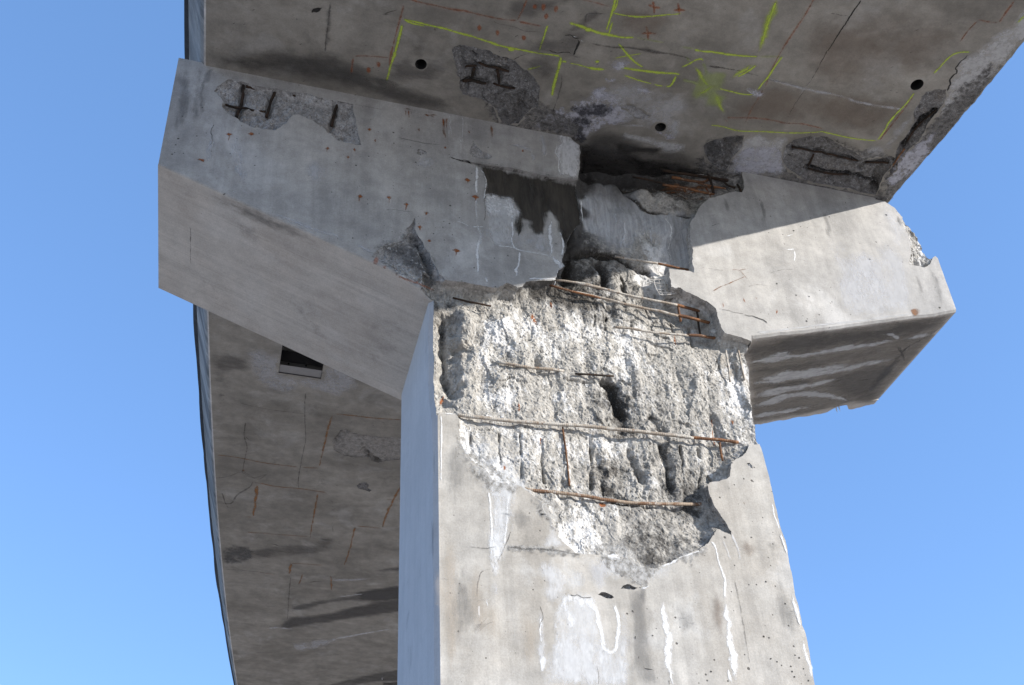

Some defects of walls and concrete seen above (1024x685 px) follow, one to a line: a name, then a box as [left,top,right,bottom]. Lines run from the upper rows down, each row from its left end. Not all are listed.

crack [820,1,861,63]
spalling [214,79,361,145]
spalling [452,45,540,125]
damp [475,88,707,285]
spalling [783,89,946,199]
spalling [901,219,933,267]
spalling [372,135,758,569]
damp [750,314,944,421]
spalling [331,428,401,463]
damp [539,596,625,683]